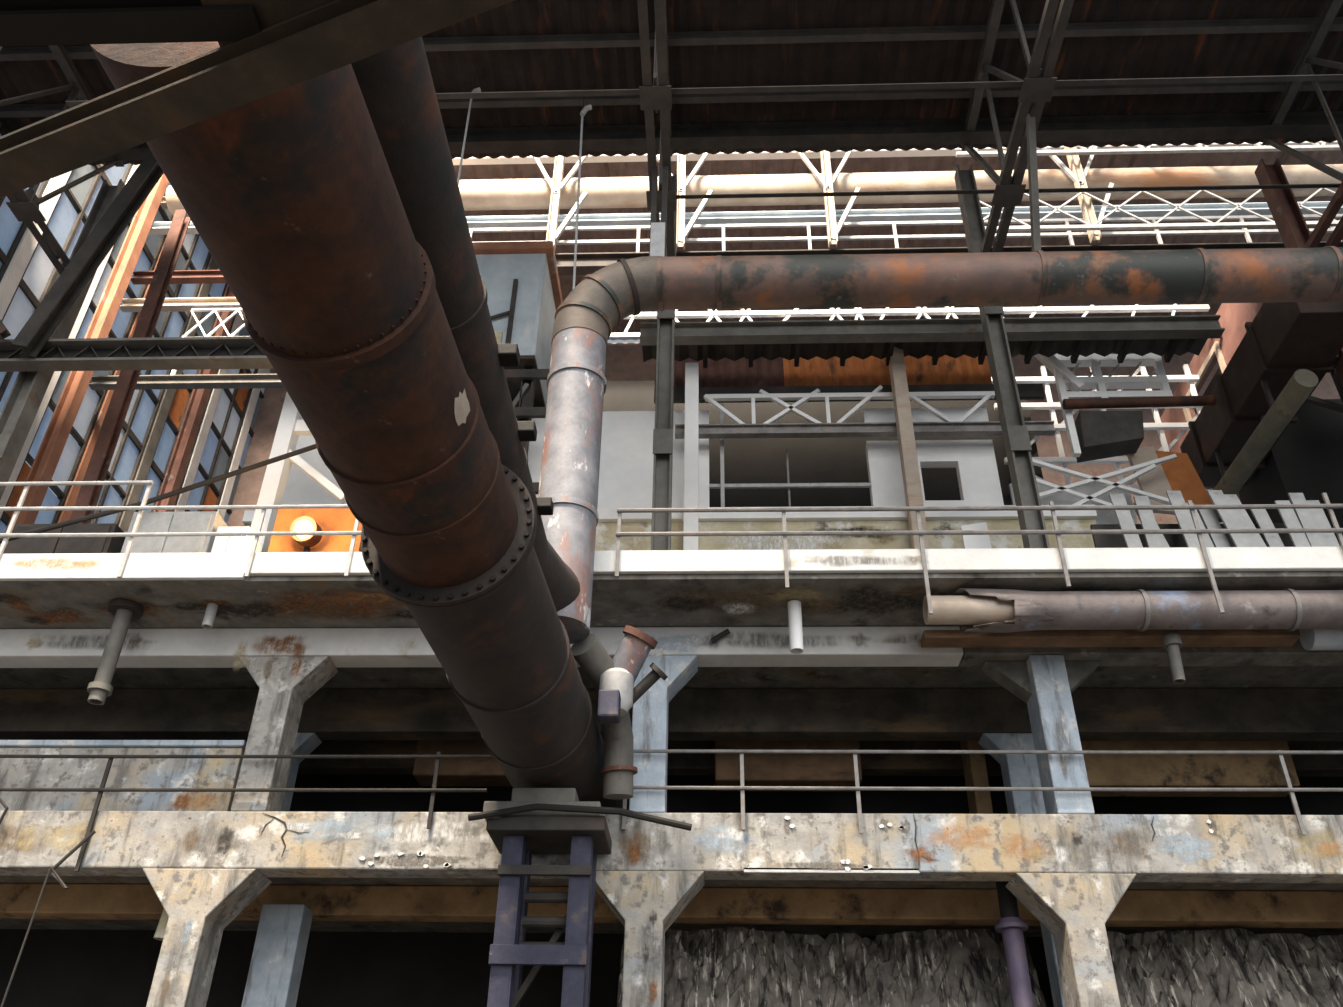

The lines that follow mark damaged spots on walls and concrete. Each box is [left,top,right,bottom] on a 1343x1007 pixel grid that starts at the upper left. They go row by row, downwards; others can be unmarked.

corrosion [239,636,304,673]
corrosion [910,847,932,861]